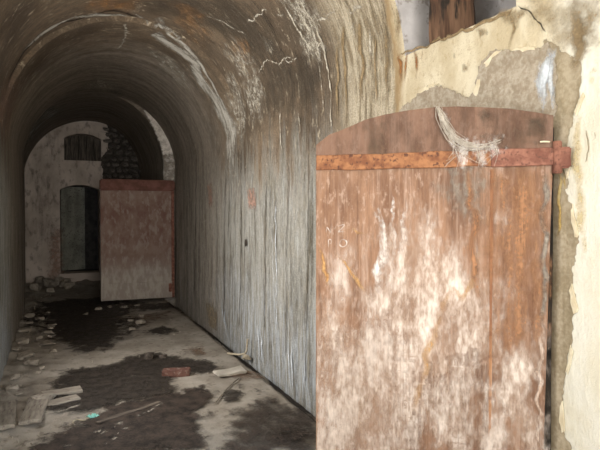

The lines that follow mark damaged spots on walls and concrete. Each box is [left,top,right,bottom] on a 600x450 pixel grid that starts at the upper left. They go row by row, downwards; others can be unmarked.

water stain [162,25,219,96]
water stain [284,0,377,126]
spalling [399,39,585,147]
water stain [19,297,184,351]
peeling [498,167,579,450]
water stain [29,352,243,450]
water stain [191,320,316,450]
peeling [481,414,503,450]